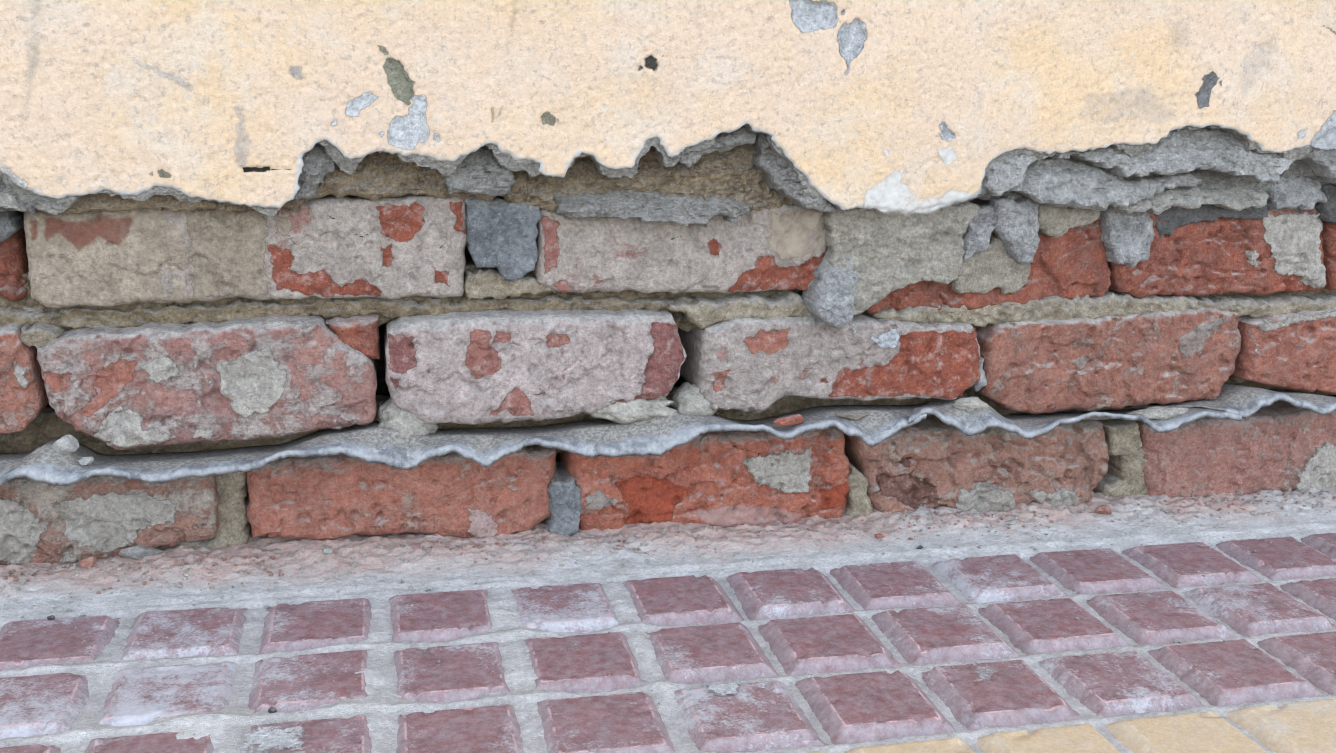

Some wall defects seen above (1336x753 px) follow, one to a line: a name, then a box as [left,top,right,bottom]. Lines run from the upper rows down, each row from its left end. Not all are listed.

spalling [638,55,658,71]
peeling [789,0,868,75]
spalling [0,163,80,215]
spalling [96,169,281,216]
peeling [331,45,467,176]
spalling [562,136,717,178]
peeling [864,148,1057,213]
peeling [1196,71,1222,109]
peeling [1171,110,1336,160]
spalling [376,202,425,267]
spalling [267,245,382,297]
spalling [728,252,826,292]